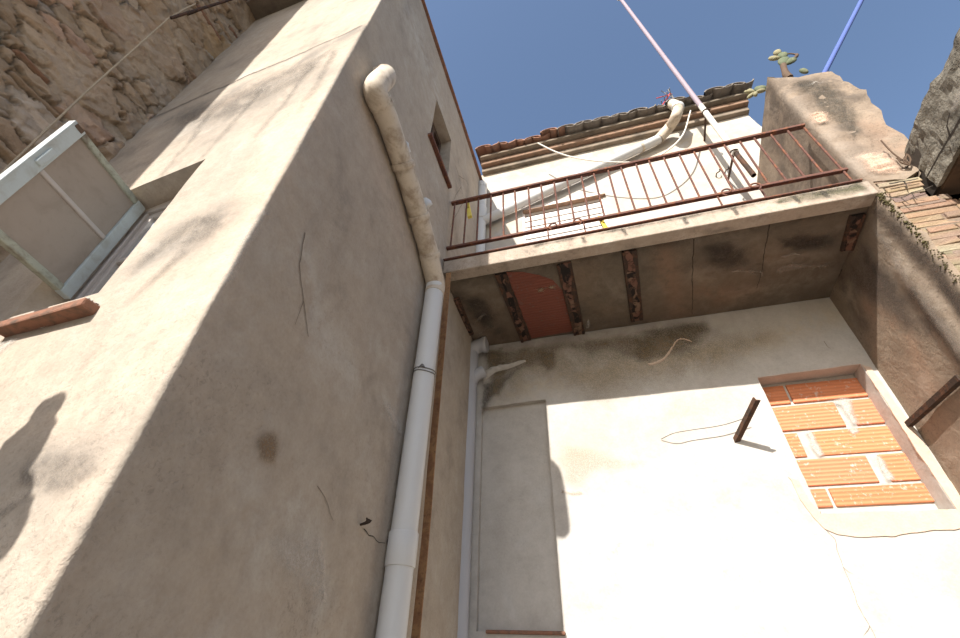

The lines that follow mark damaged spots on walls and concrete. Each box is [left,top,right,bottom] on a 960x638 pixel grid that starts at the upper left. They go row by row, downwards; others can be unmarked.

corrosion [621,251,643,322]
water stain [484,347,557,407]
peeling [788,365,960,537]